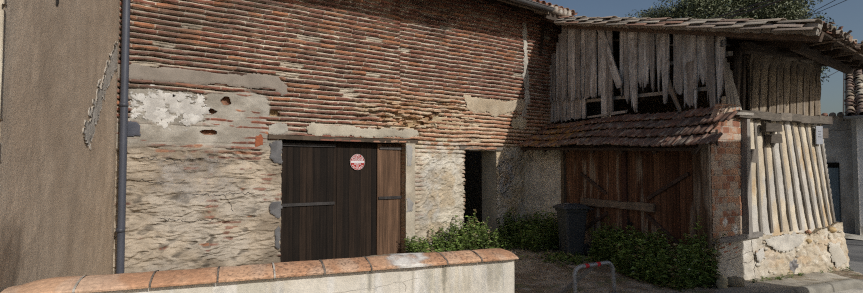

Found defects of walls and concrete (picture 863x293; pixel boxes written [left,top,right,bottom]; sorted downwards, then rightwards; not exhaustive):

flaking render [129,84,230,135]